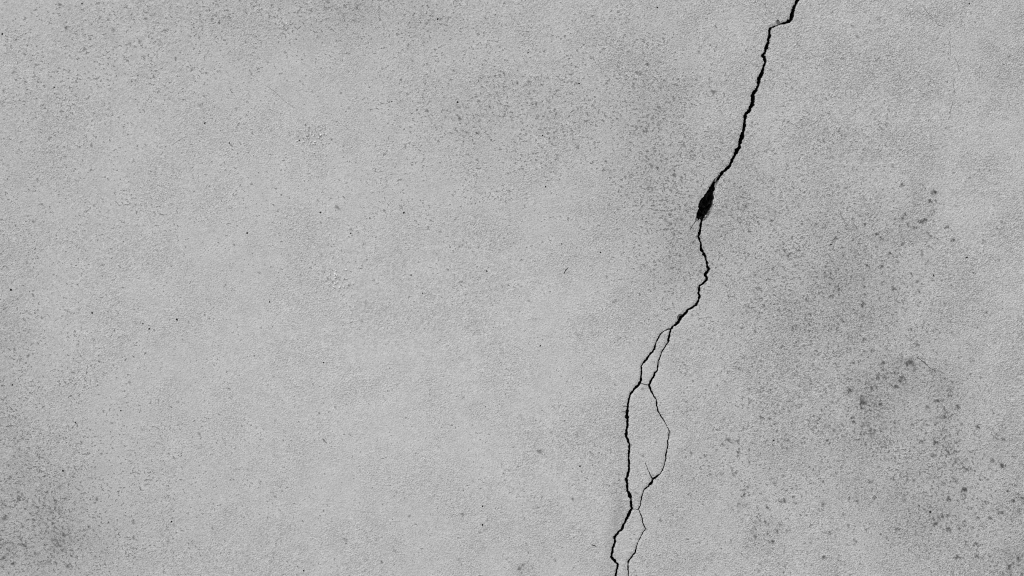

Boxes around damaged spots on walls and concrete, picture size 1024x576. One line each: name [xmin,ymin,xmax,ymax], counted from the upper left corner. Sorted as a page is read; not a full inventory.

crack [710,0,800,188]
crack [610,221,711,576]